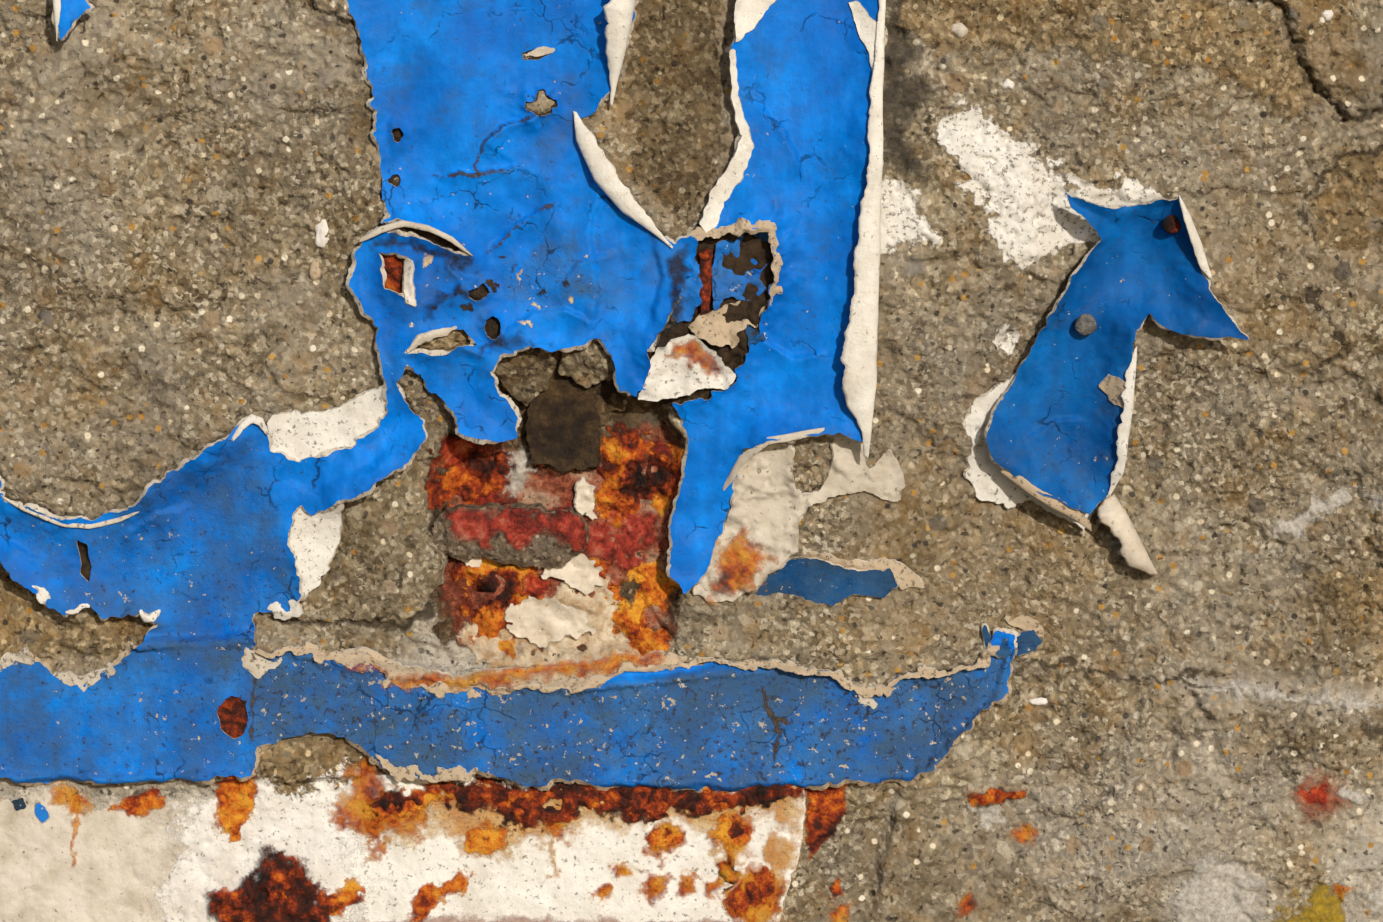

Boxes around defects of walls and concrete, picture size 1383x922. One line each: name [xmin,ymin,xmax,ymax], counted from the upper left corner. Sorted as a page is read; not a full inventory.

crack [309,0,354,22]
spalling [887,0,1325,123]
crack [1244,0,1383,241]
peeling [930,98,1250,575]
crack [1305,288,1353,370]
spalling [0,0,1044,797]
rust [352,421,685,689]
spalling [1286,551,1383,655]
peeling [12,796,51,823]
rust [214,771,258,843]
rust [206,844,366,922]
rust [332,756,850,922]